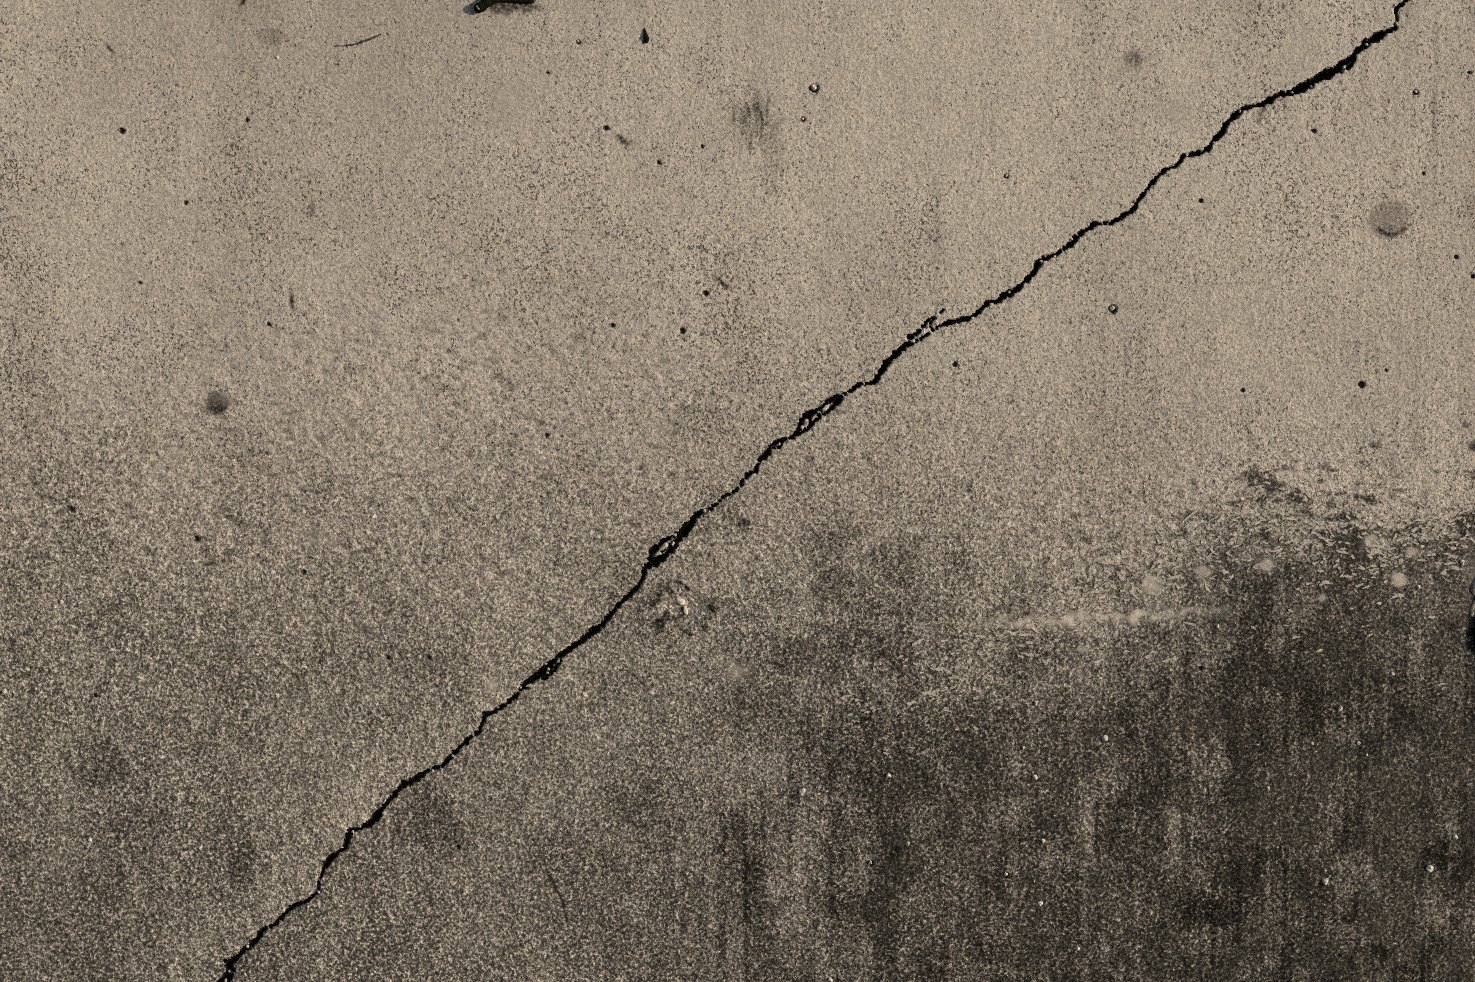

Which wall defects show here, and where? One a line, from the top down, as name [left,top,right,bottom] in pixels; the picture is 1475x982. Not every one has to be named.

crack [334,34,381,47]
crack [708,0,1408,510]
crack [217,508,707,982]
damp [0,468,1475,982]